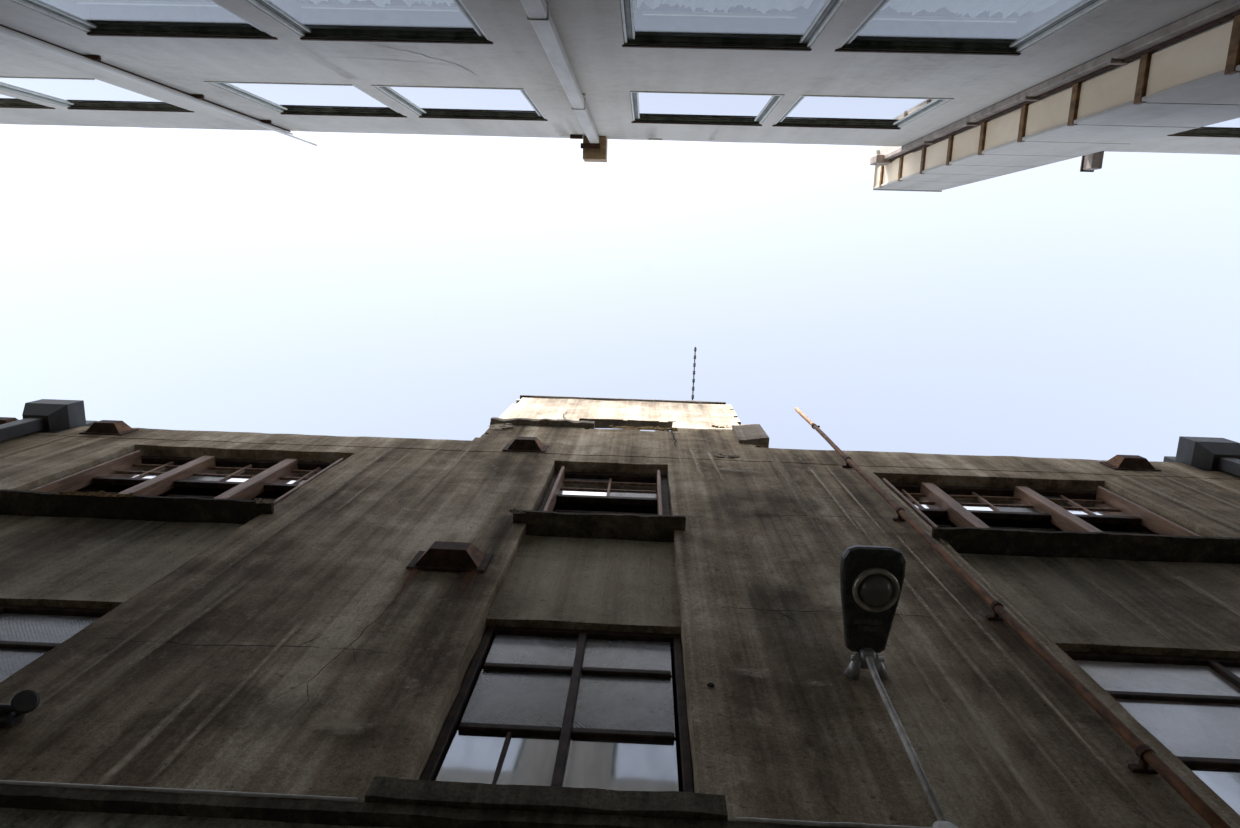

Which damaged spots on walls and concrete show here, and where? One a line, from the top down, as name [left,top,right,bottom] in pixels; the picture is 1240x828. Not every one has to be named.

crack [112,580,407,716]